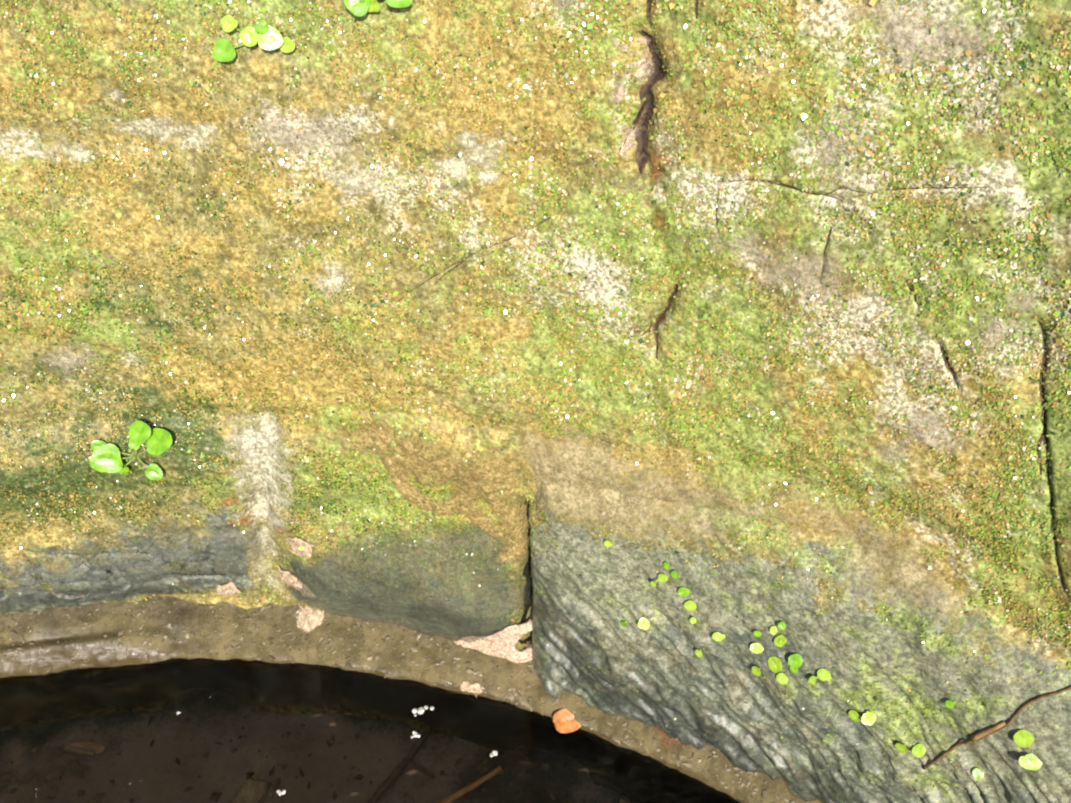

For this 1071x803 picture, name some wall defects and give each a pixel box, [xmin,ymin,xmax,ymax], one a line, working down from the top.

crack [612,0,665,184]
crack [716,179,981,238]
crack [397,211,561,302]
crack [820,227,833,283]
crack [642,284,679,359]
crack [1037,320,1067,595]